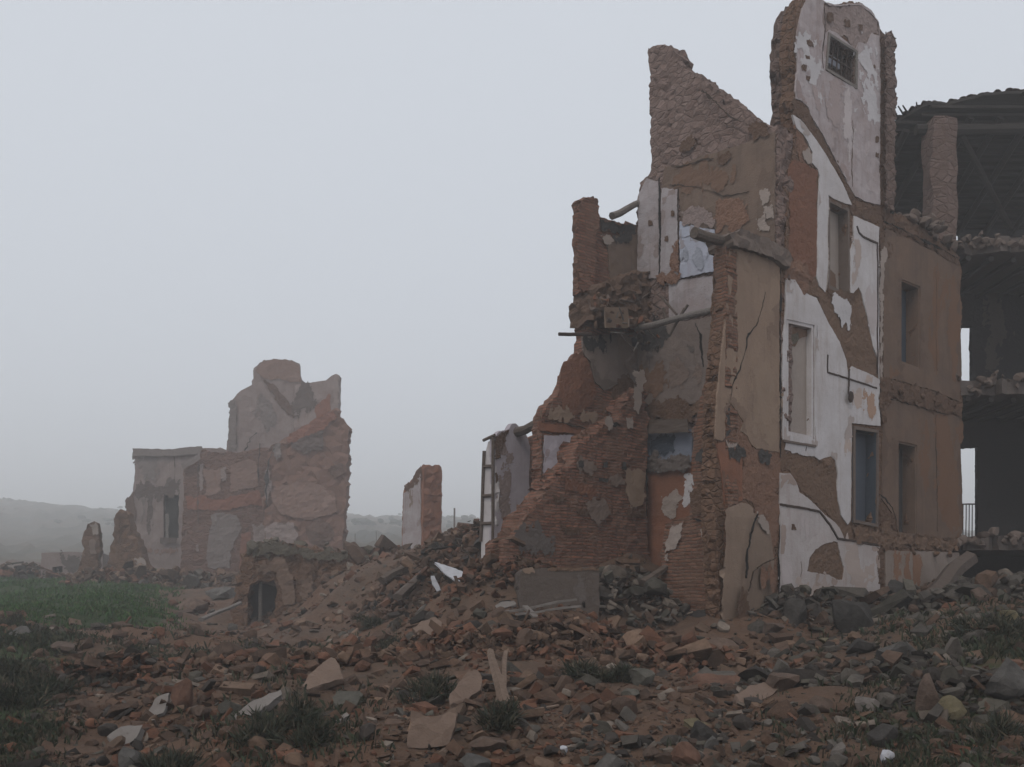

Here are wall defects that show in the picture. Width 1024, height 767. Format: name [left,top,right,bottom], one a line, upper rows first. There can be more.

spalling [746,121,769,141]
spalling [786,2,962,427]
crack [729,268,807,458]
spalling [599,433,703,561]
crack [745,514,802,593]
spalling [724,405,879,593]